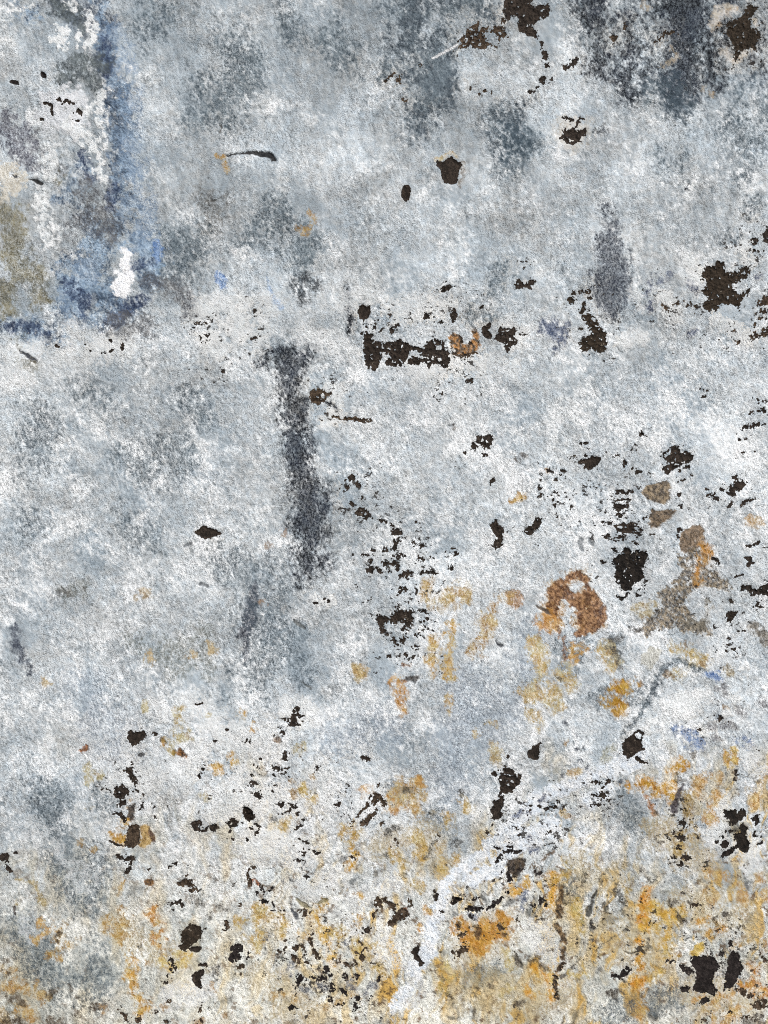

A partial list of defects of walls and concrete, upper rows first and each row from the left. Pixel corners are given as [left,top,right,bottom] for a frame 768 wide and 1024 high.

peeling [356,281,528,397]
peeling [661,223,768,349]
damp [708,310,762,348]
damp [0,181,714,1024]
peeling [336,465,459,665]
rust [386,563,644,735]
peeling [488,430,768,654]
damp [720,664,750,720]
rust [93,874,200,1023]
rust [232,878,389,1024]
rust [434,745,768,1024]
damp [714,966,753,994]